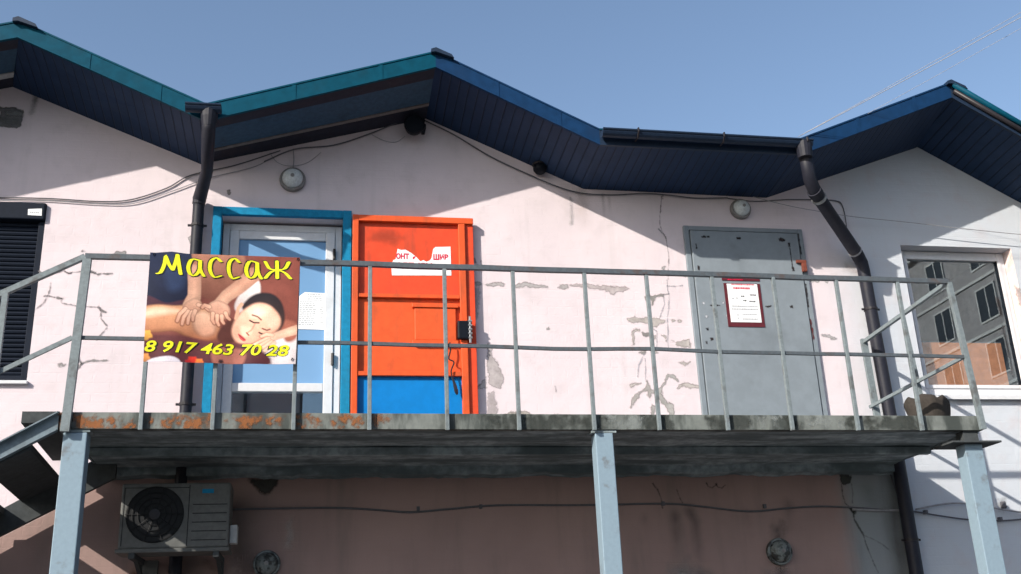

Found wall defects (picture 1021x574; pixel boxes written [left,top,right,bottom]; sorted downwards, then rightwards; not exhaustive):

spalling [0,107,24,128]
crack [37,271,107,336]
peeling [475,282,629,317]
peeling [627,317,691,354]
peeling [478,343,530,414]
peeling [630,374,699,415]
corrosion [74,415,136,428]
corrosion [149,413,211,428]
corrosion [236,415,281,429]
corrosion [296,413,364,429]